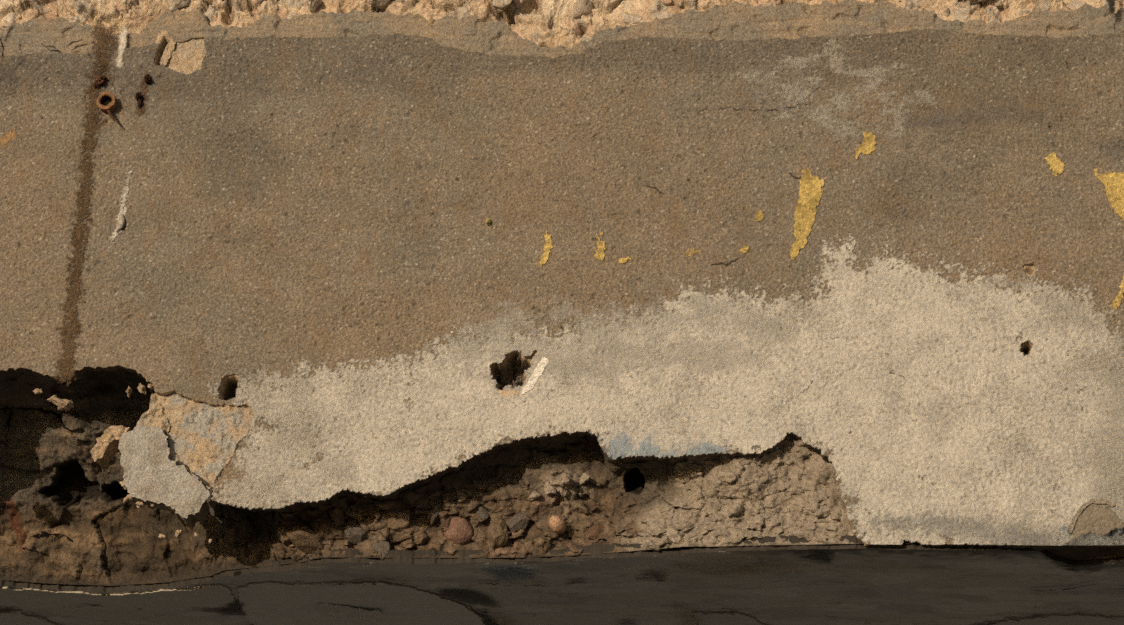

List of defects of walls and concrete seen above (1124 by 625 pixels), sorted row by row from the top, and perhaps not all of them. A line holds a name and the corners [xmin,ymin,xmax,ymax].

crack [0,406,98,447]
peeling [0,234,1124,625]